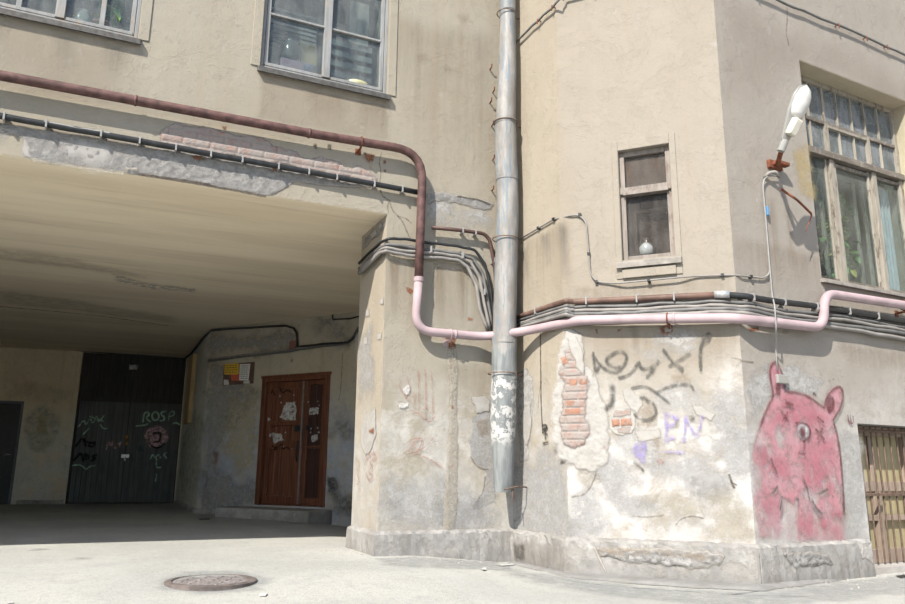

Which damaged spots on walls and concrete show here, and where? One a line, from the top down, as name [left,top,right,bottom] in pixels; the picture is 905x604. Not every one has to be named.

spalling [0,123,377,197]
spalling [513,329,661,537]